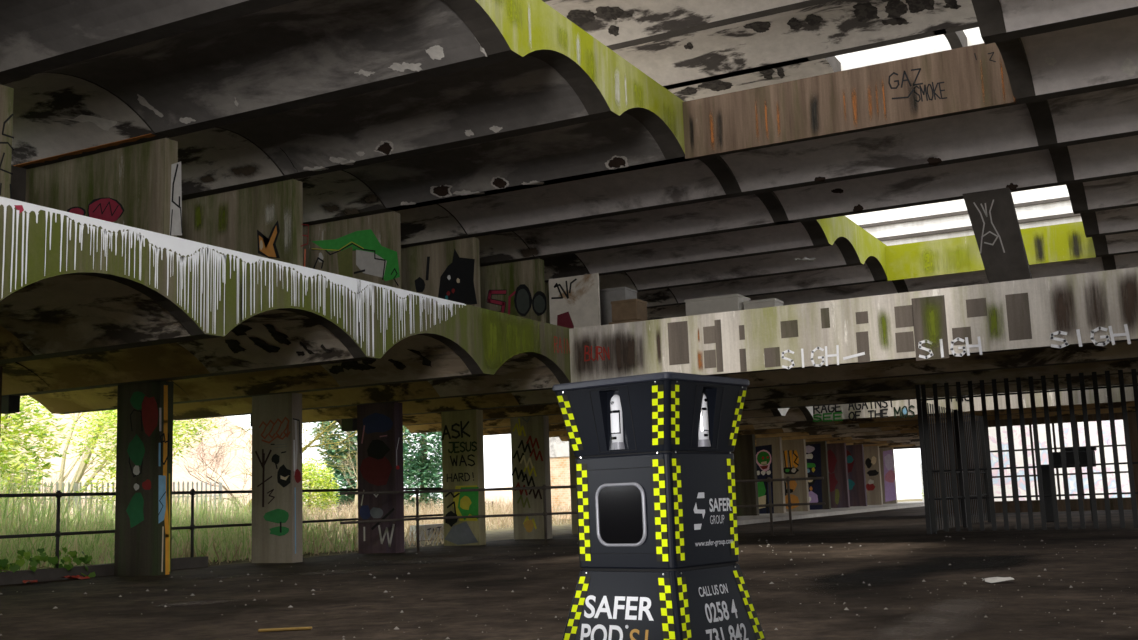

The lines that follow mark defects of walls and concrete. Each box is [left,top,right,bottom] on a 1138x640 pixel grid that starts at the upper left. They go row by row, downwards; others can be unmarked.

damp [616,76,643,106]
damp [1034,237,1044,261]
damp [1072,234,1081,257]
damp [485,315,540,367]